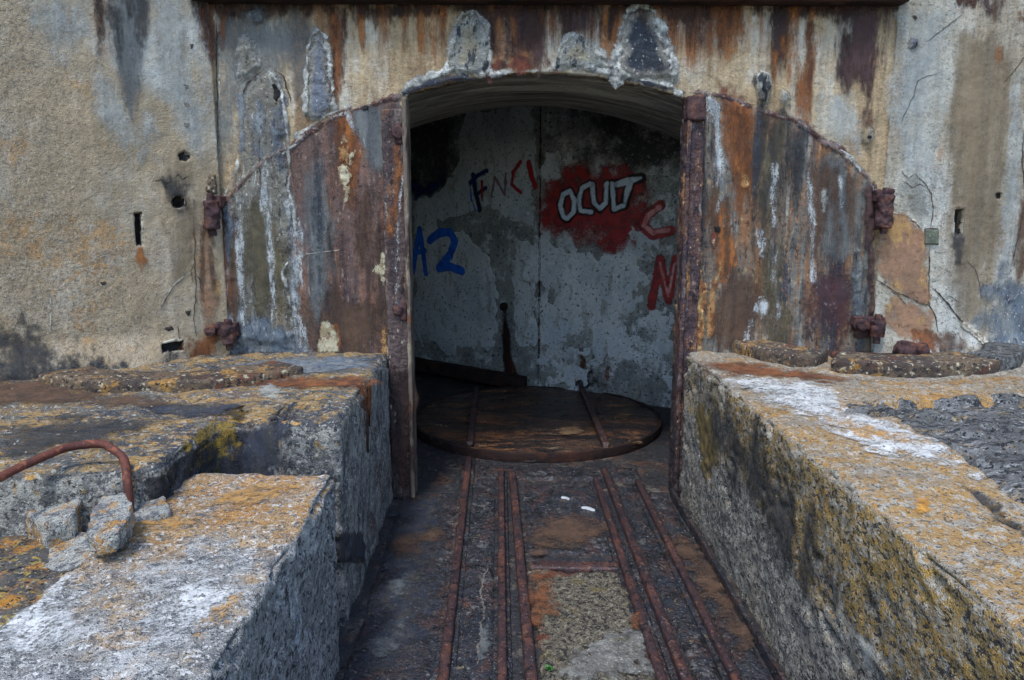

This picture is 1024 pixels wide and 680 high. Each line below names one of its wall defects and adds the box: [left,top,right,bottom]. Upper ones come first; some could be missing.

corrosion [191,0,287,62]
water stain [95,0,200,161]
peeling [338,136,355,202]
corrosion [296,4,894,356]
crack [875,171,989,344]
peeling [317,321,341,353]
corrosion [523,515,608,555]
corrosion [529,571,560,628]